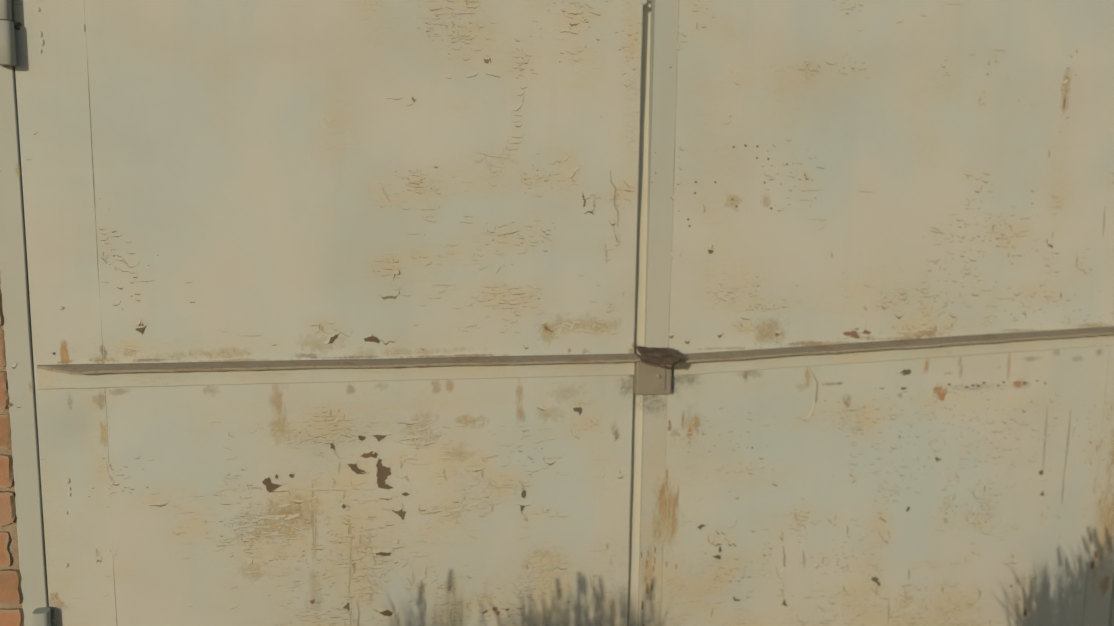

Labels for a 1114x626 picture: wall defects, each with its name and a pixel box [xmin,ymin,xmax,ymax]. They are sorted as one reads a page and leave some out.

peeling [309,320,396,348]
peeling [284,407,427,526]